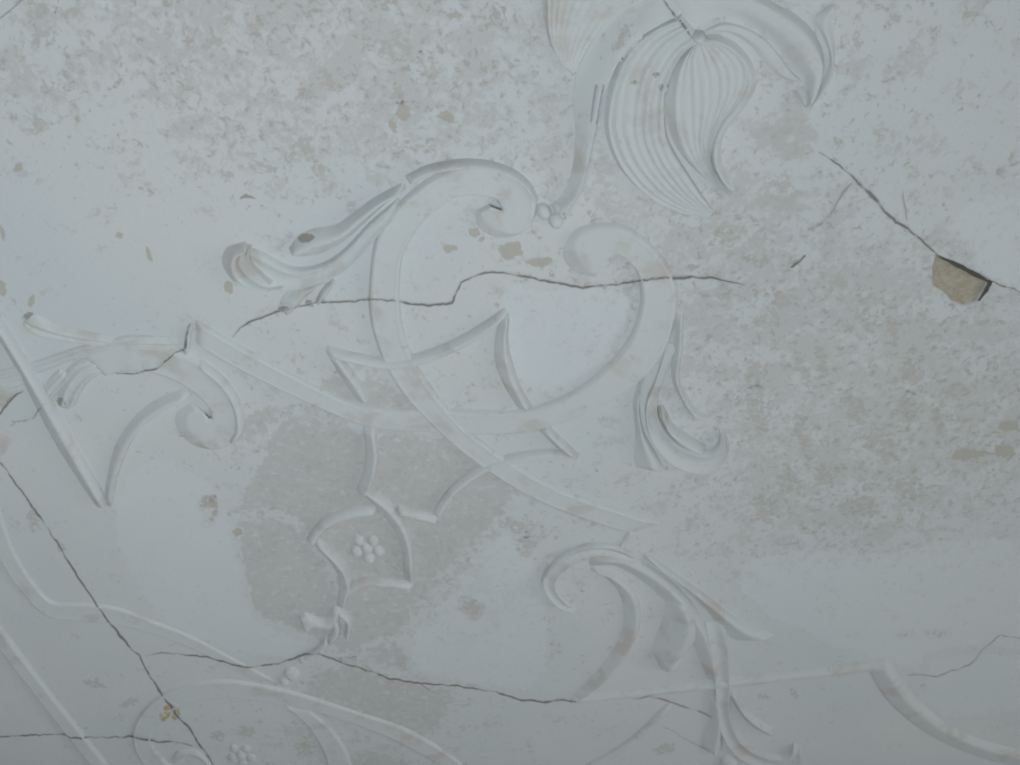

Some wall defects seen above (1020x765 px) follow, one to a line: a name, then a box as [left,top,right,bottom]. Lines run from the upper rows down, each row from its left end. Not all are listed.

crack [663,0,693,38]
crack [809,152,937,254]
crack [232,271,745,338]
crack [790,254,806,268]
flaking render [933,255,993,304]
crack [993,281,1020,294]
crack [116,323,190,375]
crack [0,391,46,423]
crack [0,462,576,765]